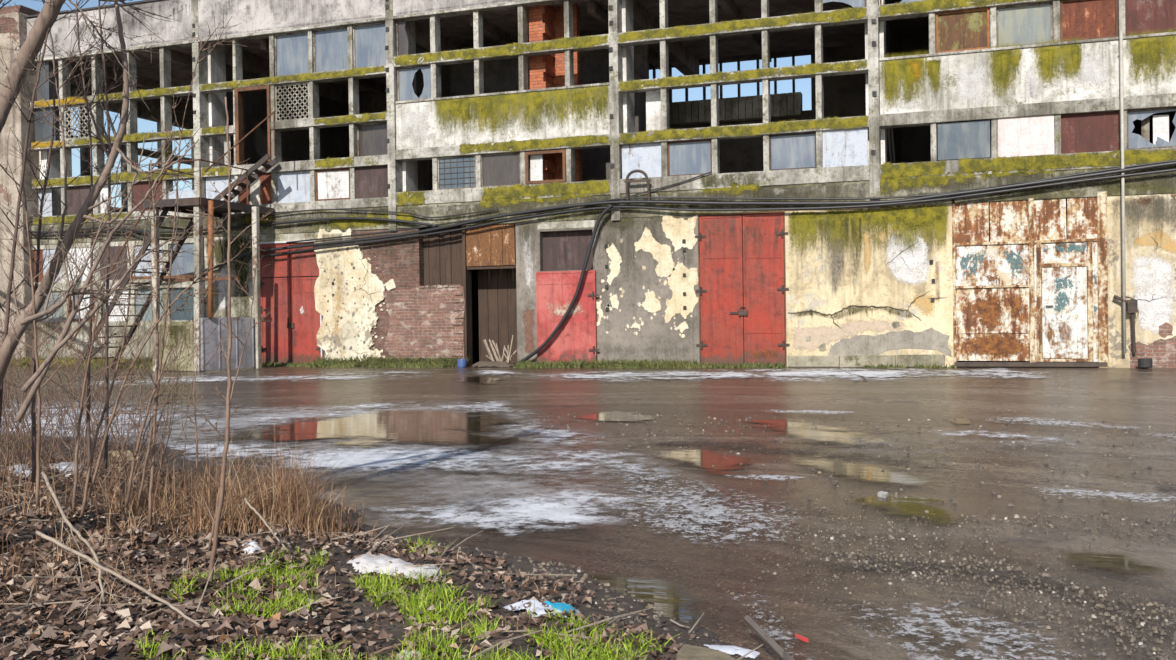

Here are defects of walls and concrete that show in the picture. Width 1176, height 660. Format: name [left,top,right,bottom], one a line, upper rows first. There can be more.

damp [885,60,939,111]
damp [956,49,1054,103]
damp [1071,45,1106,85]
damp [1132,39,1163,75]
flaking render [300,228,396,361]
peeling [522,230,534,287]
flaking render [522,310,535,353]
peeling [549,215,699,338]
damp [794,217,861,291]
crack [789,291,946,329]
damp [874,216,940,285]
rust [965,294,1024,358]